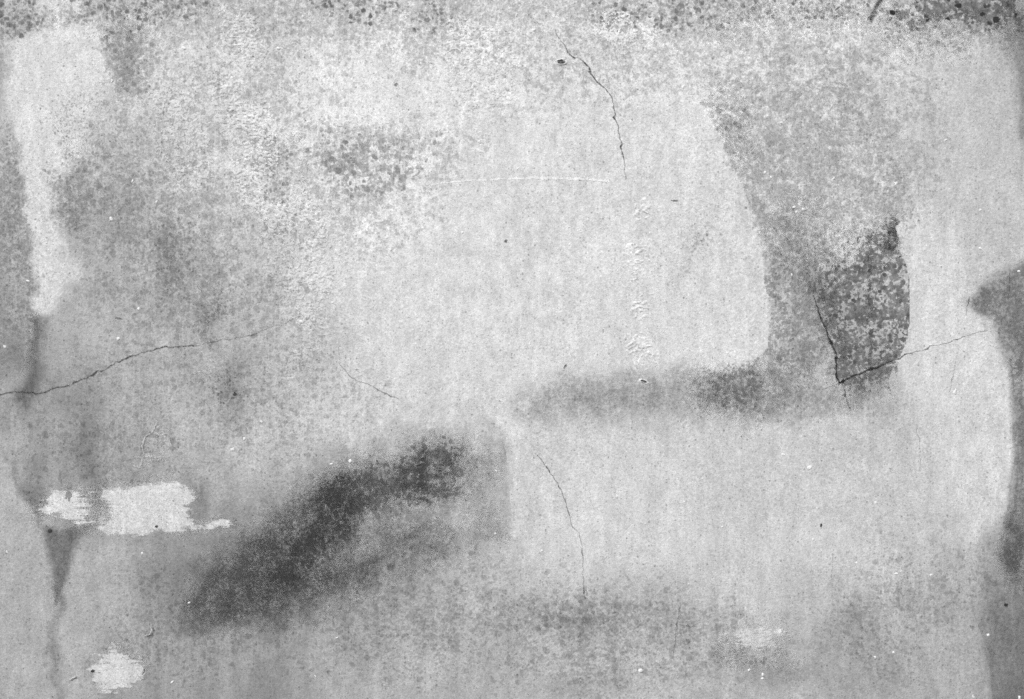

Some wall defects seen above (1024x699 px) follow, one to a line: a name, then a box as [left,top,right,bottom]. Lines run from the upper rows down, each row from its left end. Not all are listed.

crack [558,37,624,157]
peeling [0,421,233,539]
damp [193,450,454,630]
damp [810,225,910,387]
crack [814,298,964,397]
damp [972,266,1024,568]